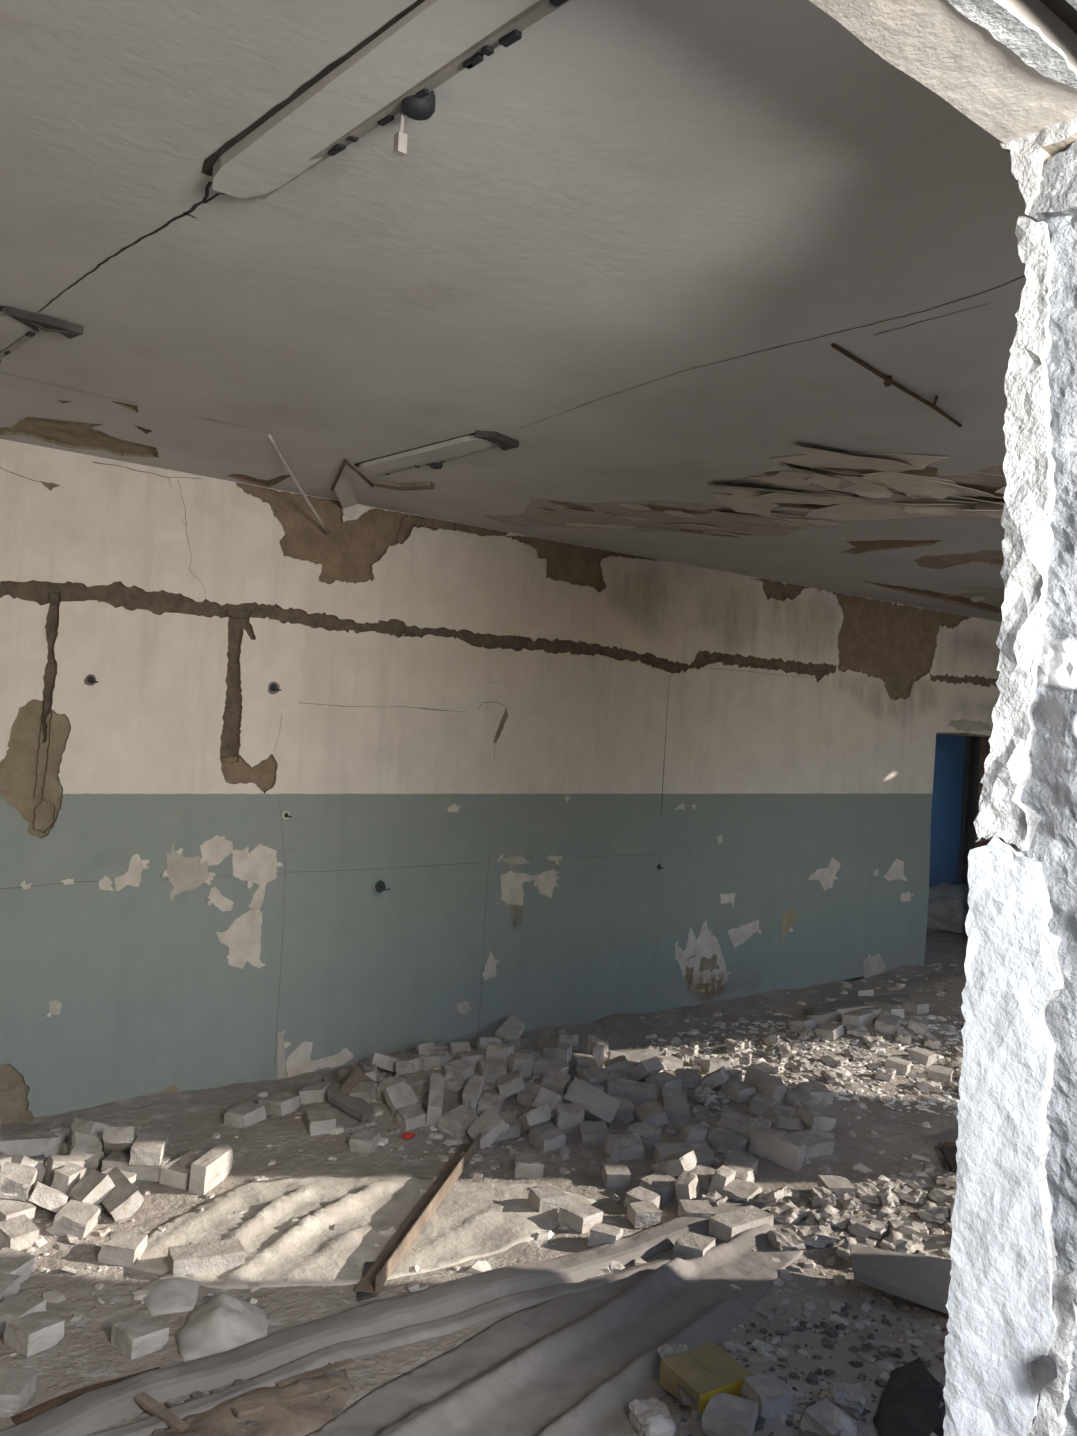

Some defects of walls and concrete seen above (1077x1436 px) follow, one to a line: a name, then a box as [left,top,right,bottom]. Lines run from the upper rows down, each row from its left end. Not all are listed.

crack [37,181,225,313]
spalling [0,401,159,458]
spalling [228,444,1007,592]
spalling [749,576,1005,700]
spalling [0,699,71,838]
peeling [98,835,283,969]
peeling [498,854,562,905]
peeling [675,919,762,992]
spalling [0,1063,35,1124]